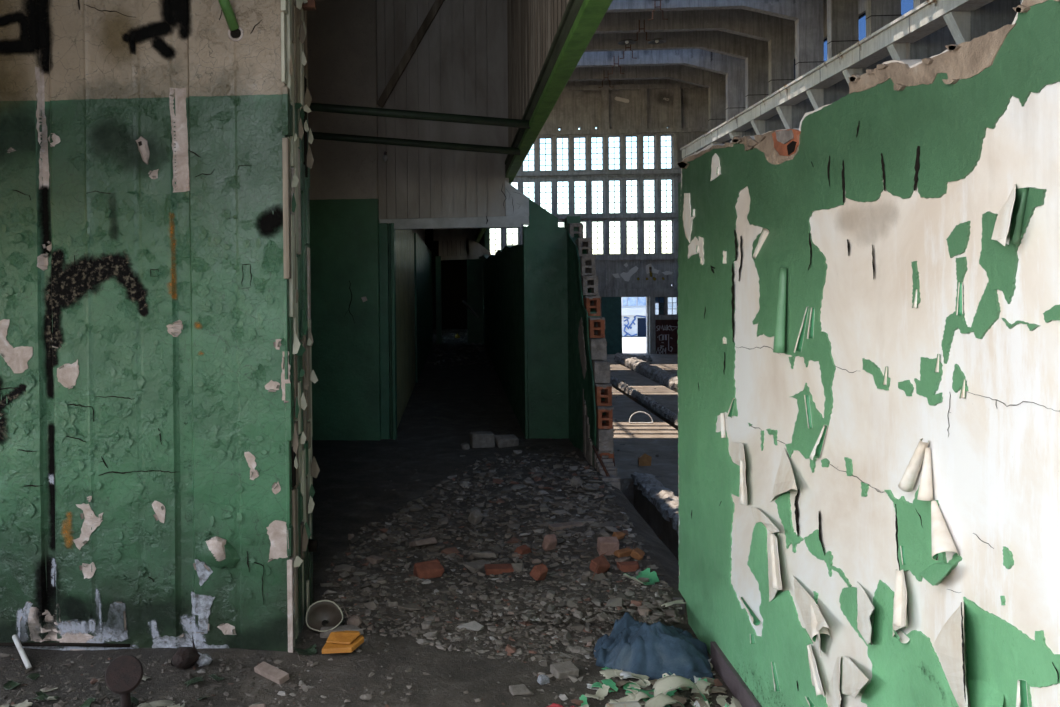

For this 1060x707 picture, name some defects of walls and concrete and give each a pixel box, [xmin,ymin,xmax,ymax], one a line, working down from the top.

peeling [35,66,61,189]
peeling [169,88,190,193]
corrosion [169,215,177,299]
peeling [0,319,33,400]
peeling [57,359,79,443]
peeling [265,308,318,411]
peeling [599,0,1060,707]
crack [947,392,1060,436]
peeling [73,482,104,550]
peeling [266,425,320,567]
peeling [12,601,132,651]
peeling [152,559,237,648]